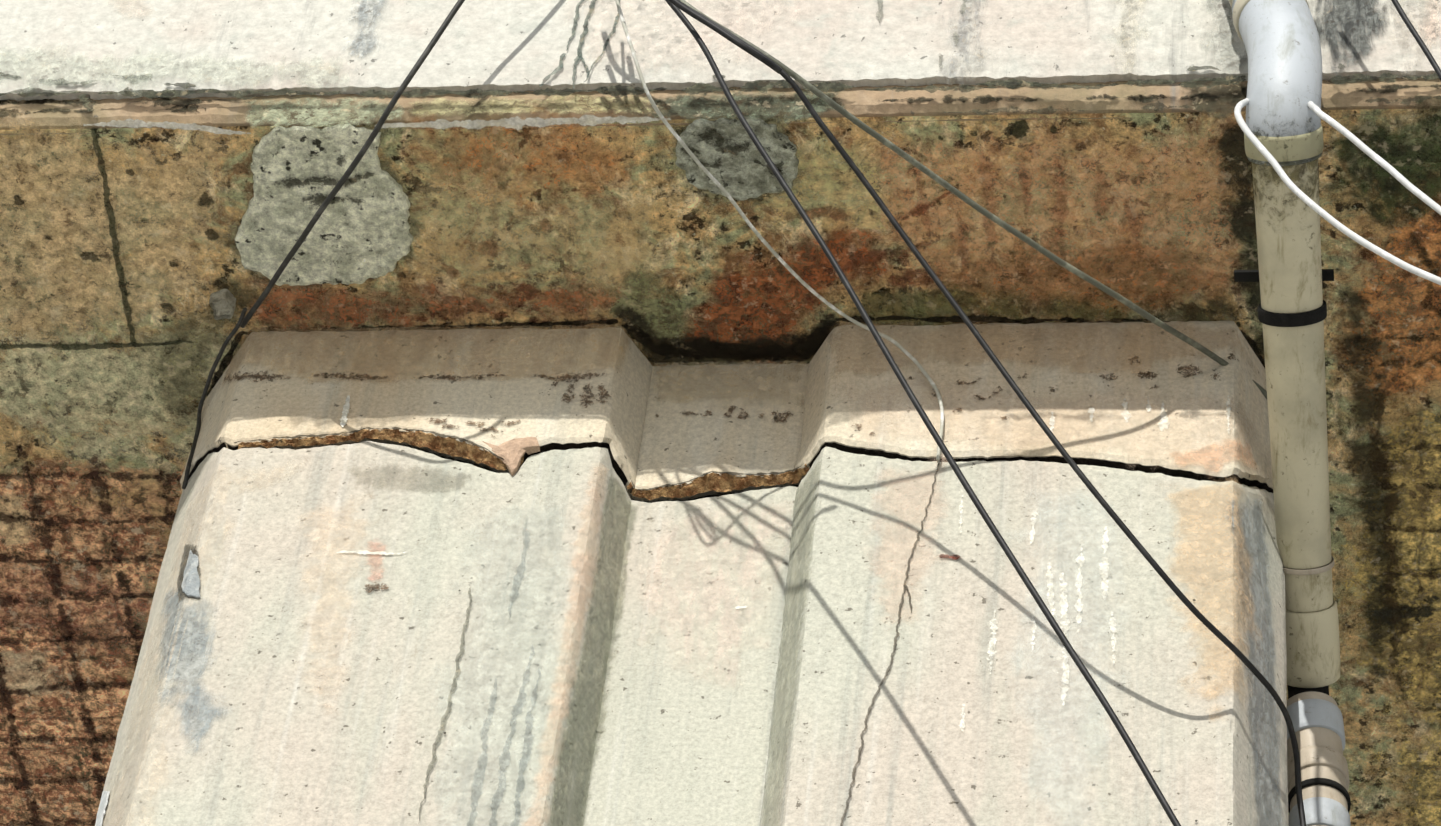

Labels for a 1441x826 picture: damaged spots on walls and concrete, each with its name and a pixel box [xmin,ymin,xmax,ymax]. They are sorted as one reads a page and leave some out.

crack [539,0,620,88]
damp [1314,0,1386,72]
corrosion [904,192,951,219]
corrosion [680,206,938,344]
damp [161,592,216,737]
crack [0,427,1273,826]
efflorescence [988,611,997,670]
efflorescence [1031,527,1117,705]